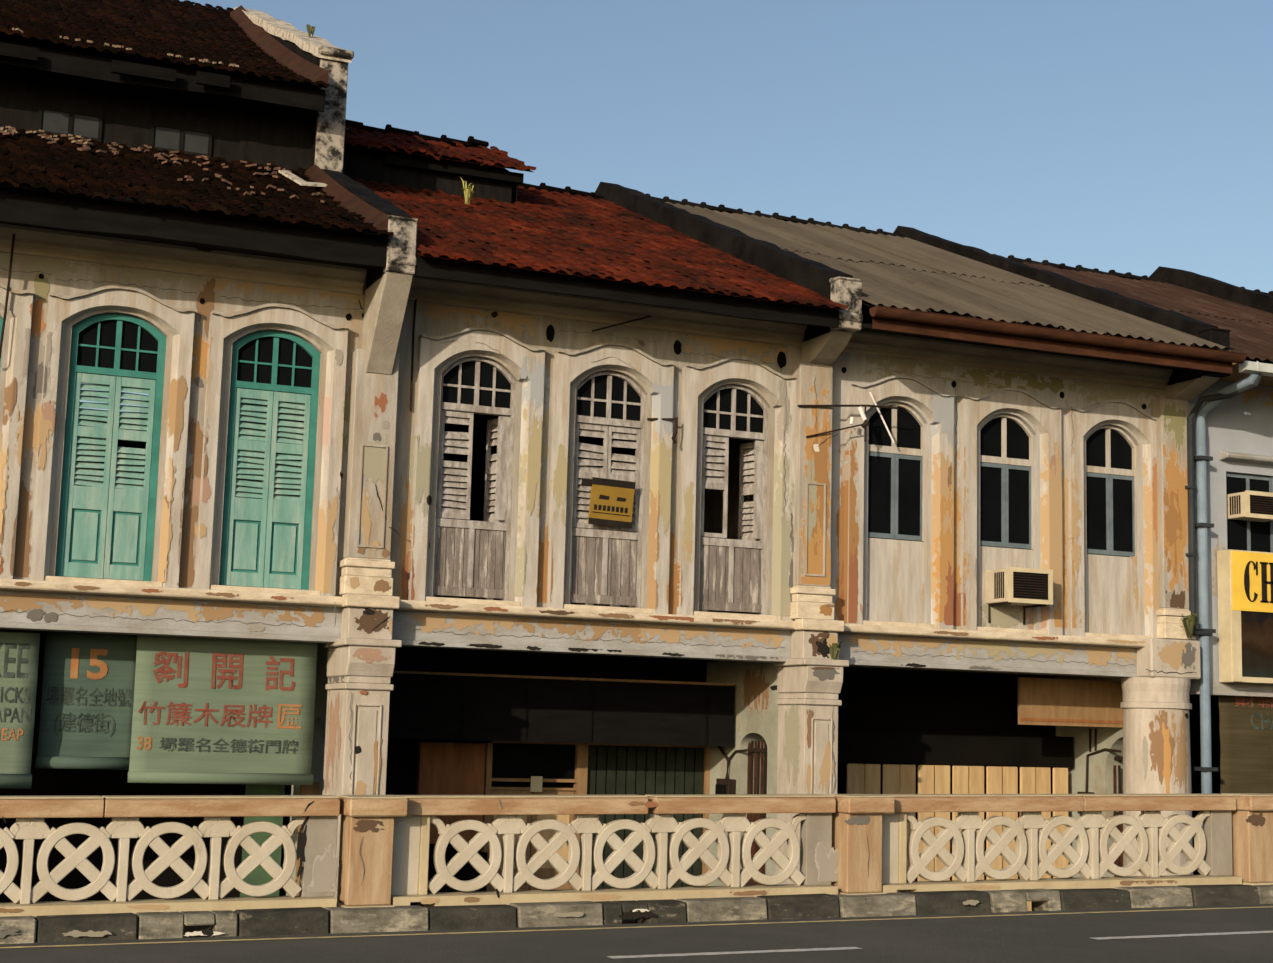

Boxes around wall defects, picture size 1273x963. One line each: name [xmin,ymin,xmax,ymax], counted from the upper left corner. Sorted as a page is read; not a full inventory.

peeling [2,328,56,470]
peeling [167,375,211,509]